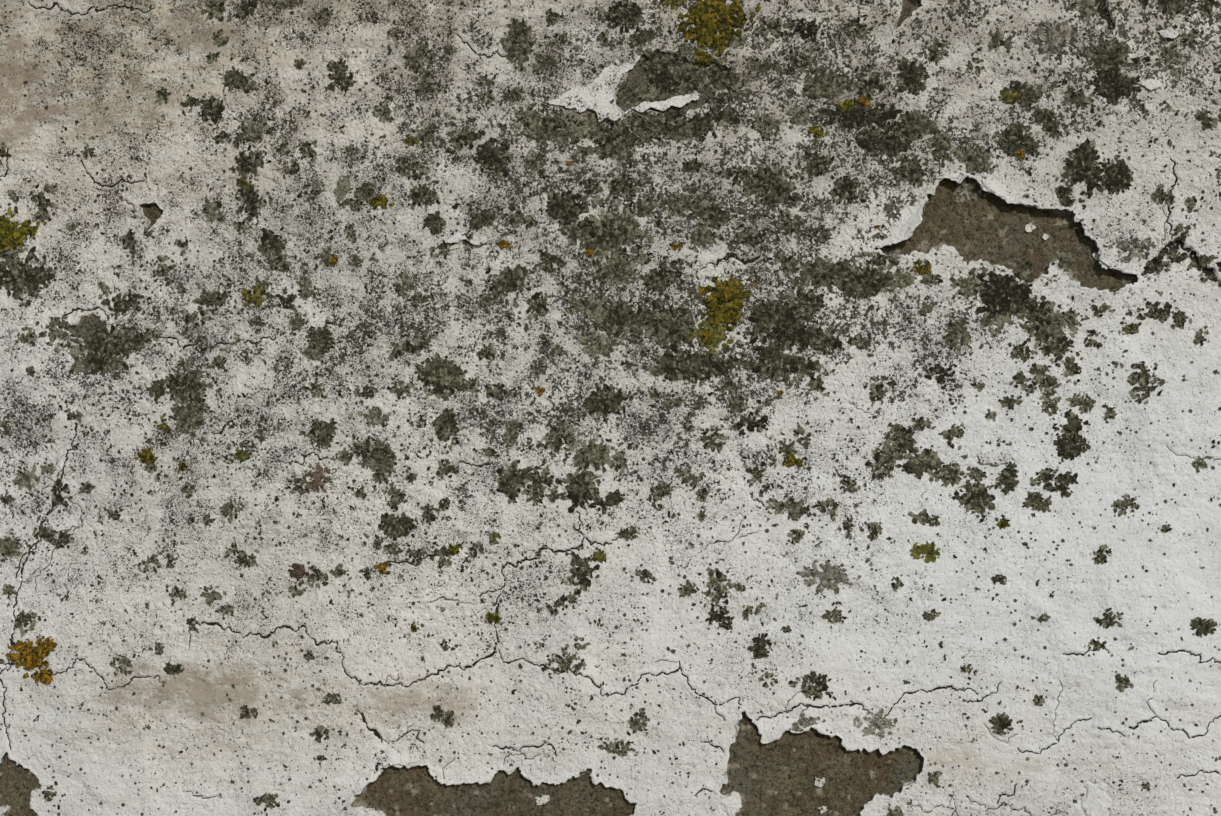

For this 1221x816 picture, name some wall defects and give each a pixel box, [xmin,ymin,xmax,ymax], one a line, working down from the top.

crack [1095,0,1115,30]
peeling [548,52,727,122]
spalling [870,170,1141,295]
spalling [1212,257,1221,281]
crack [0,423,84,750]
crack [188,511,1221,794]
spalling [0,748,44,816]
spalling [346,762,640,816]
spalling [713,705,927,816]
crack [912,783,1065,816]